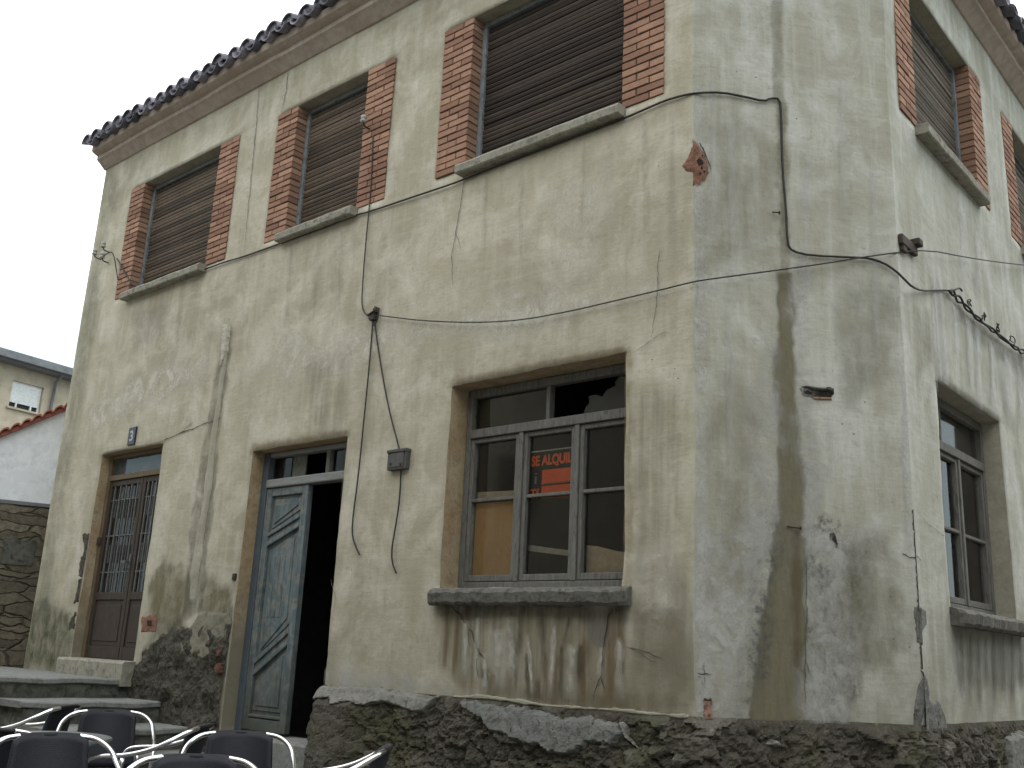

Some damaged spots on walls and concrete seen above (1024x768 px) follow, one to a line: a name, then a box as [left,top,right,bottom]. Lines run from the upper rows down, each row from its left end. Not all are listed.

spalling [682,139,711,187]
damp [694,270,879,723]
spalling [68,533,89,630]
crack [902,509,947,606]
flaking render [127,615,232,753]
damp [456,606,585,700]
crack [593,608,662,697]